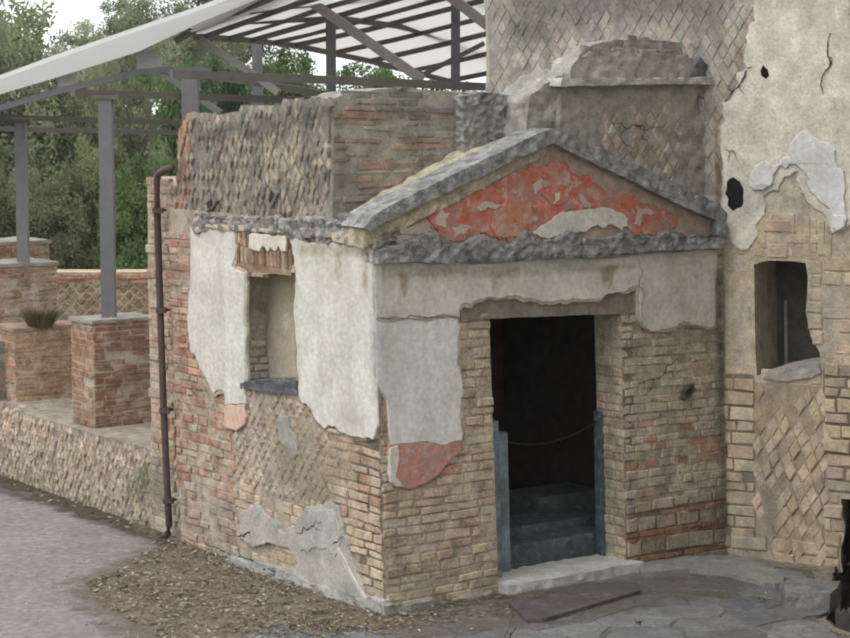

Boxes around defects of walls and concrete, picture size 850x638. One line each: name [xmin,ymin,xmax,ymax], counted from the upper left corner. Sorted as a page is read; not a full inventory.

crack [820,33,833,94]
flaking render [717,0,850,251]
spalling [205,196,220,212]
flaking render [393,202,472,243]
flaking render [476,179,672,238]
flaking render [187,224,719,489]
flaking render [236,500,369,598]